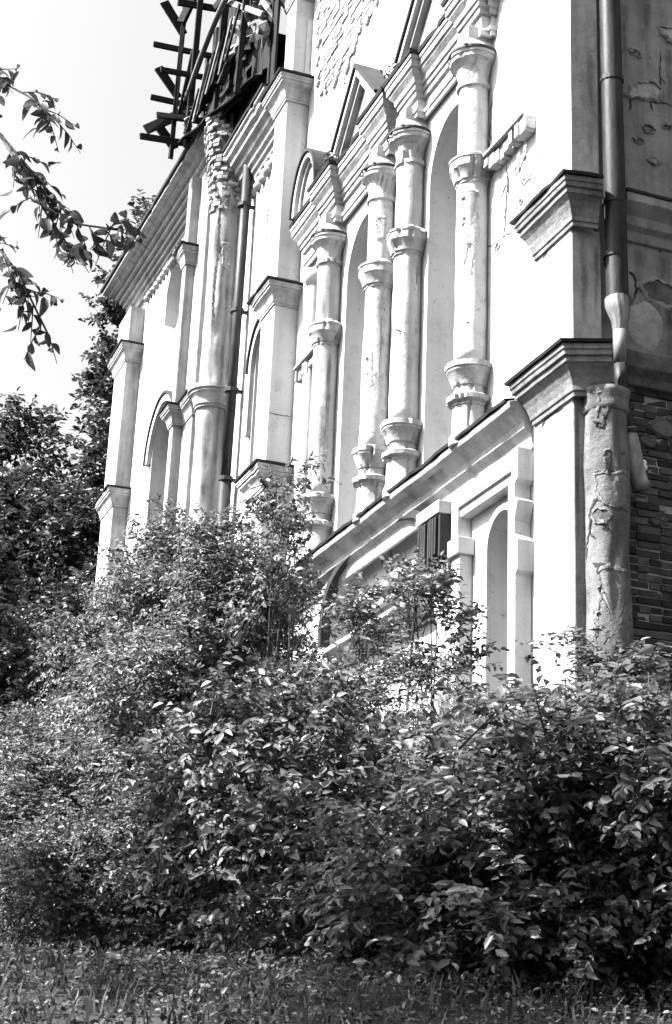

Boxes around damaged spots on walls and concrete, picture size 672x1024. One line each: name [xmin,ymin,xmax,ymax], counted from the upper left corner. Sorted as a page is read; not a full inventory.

spalling [314,0,379,97]
spalling [623,78,665,104]
spalling [633,121,672,145]
spalling [637,275,672,311]
spalling [593,391,611,429]
spalling [591,448,629,525]
spalling [592,562,633,686]